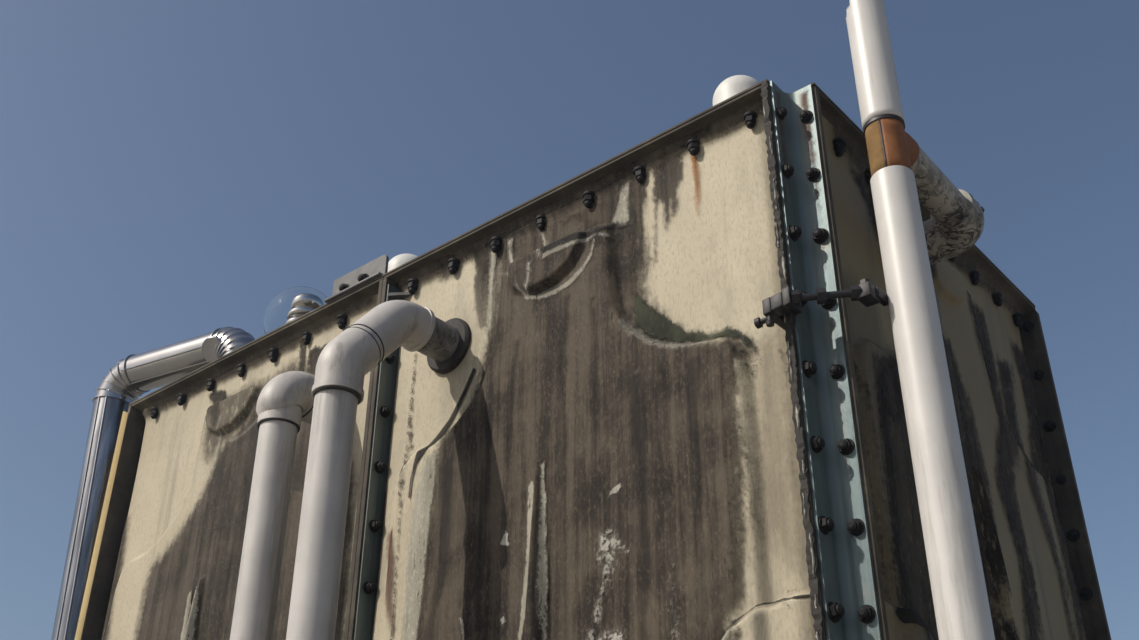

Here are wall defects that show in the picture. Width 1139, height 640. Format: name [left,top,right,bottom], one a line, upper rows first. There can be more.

water stain [101,517,127,640]
water stain [134,293,374,640]
peeling [518,463,548,640]
water stain [397,101,810,640]